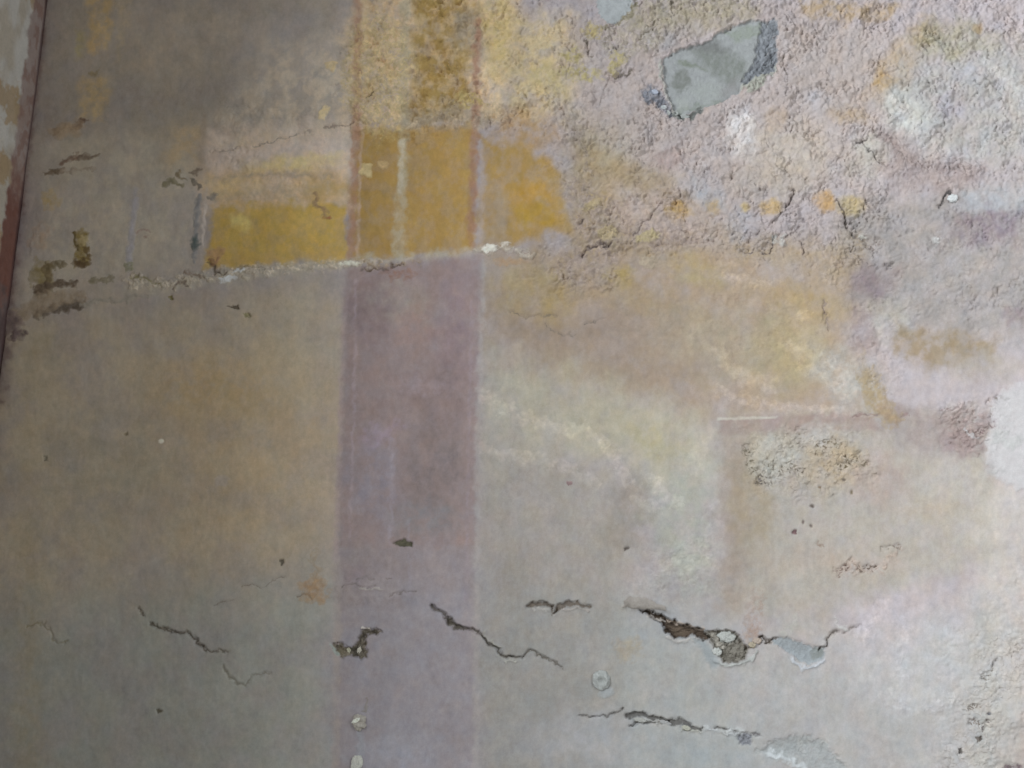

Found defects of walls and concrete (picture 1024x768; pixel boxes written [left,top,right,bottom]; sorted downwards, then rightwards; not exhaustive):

spalling [471,0,989,317]
leakage [5,197,150,342]
spalling [119,256,423,301]
peeling [937,396,997,458]
spalling [738,421,879,508]
crack [137,606,271,687]
spalling [329,626,382,661]
crack [430,603,563,670]
crack [526,600,592,617]
spalling [622,596,826,672]
crack [578,707,739,736]